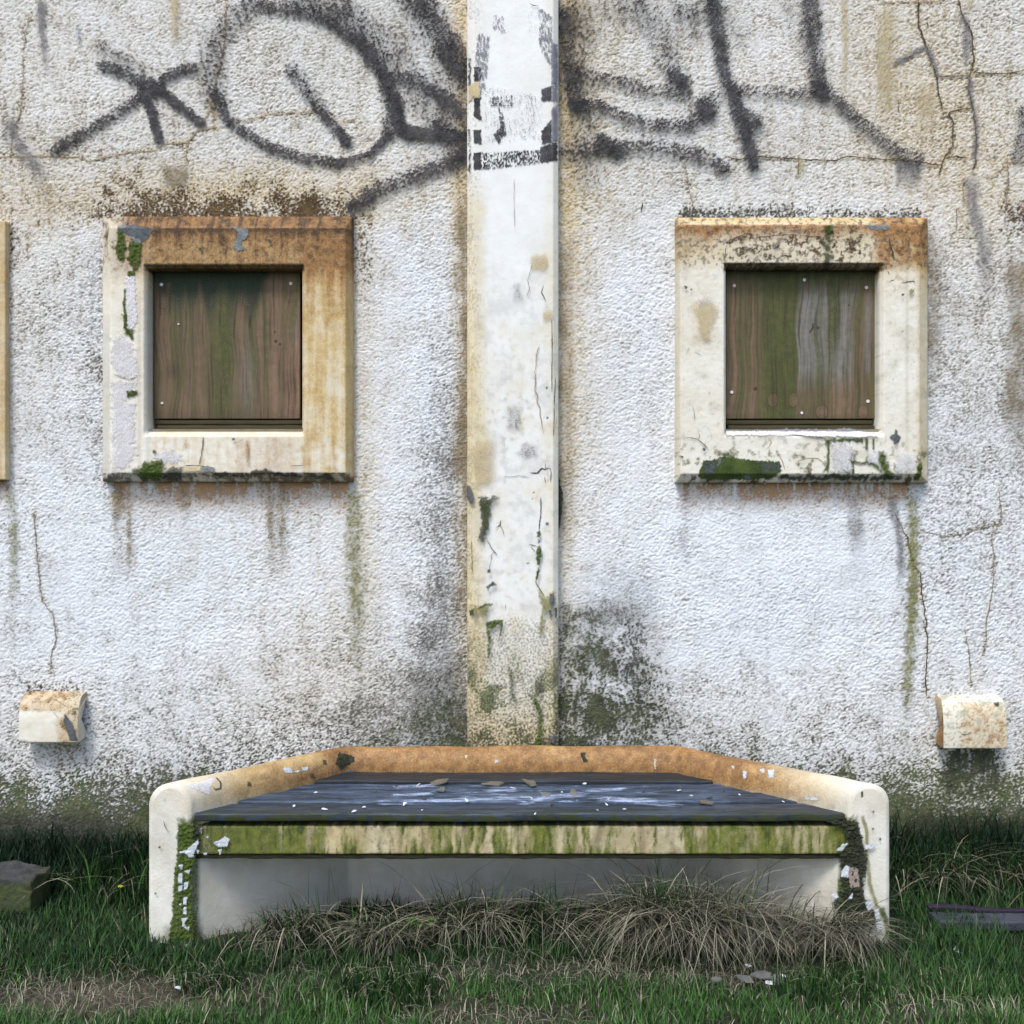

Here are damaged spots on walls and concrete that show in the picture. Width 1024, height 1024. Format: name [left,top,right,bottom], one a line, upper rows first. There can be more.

crack [728,0,1024,229]
water stain [163,164,188,186]
spalling [117,224,155,243]
peeling [109,276,138,470]
peeling [153,449,215,473]
peeling [726,428,917,474]
spalling [546,472,563,530]
water stain [889,501,905,573]
crack [33,511,57,672]
crack [894,491,1003,696]
spalling [830,816,883,932]